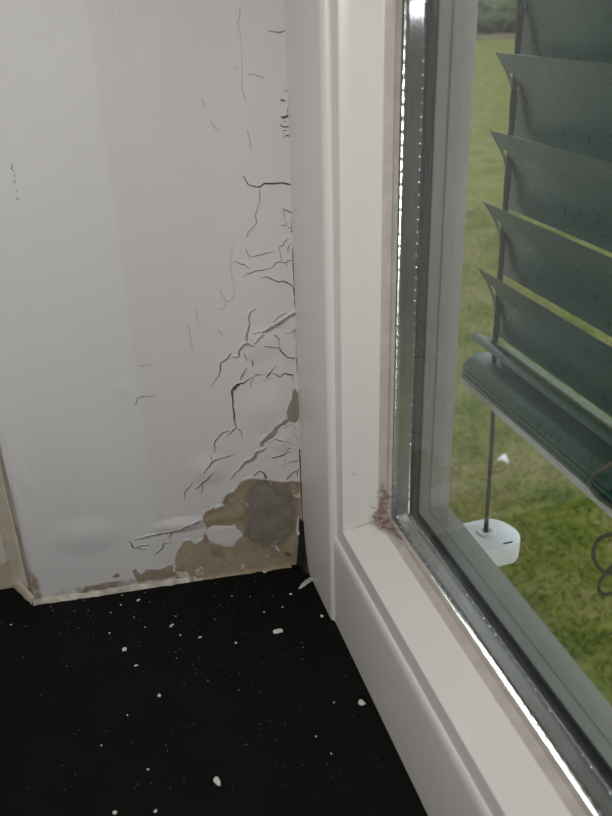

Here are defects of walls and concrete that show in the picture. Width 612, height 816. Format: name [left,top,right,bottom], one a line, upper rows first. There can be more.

crack [232,8,265,101]
crack [268,27,285,35]
crack [279,89,289,139]
crack [183,174,303,521]
crack [128,518,203,556]
peeling [72,475,302,593]